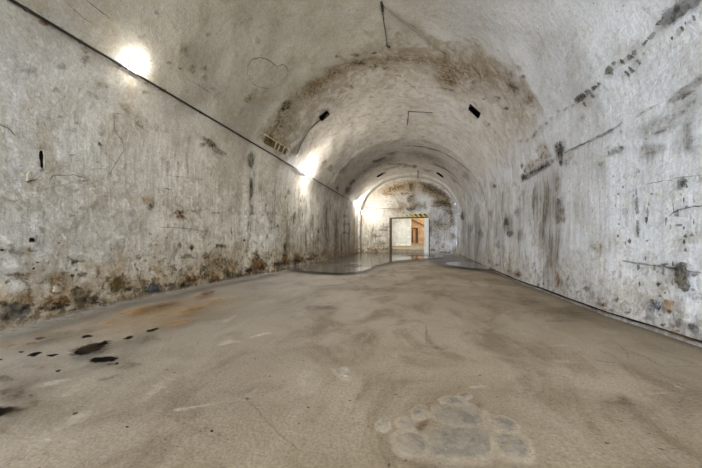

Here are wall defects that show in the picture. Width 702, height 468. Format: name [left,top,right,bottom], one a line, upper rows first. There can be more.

peeling [574,82,601,107]
water stain [524,176,565,256]
water stain [137,280,172,295]
peeling [662,262,697,292]